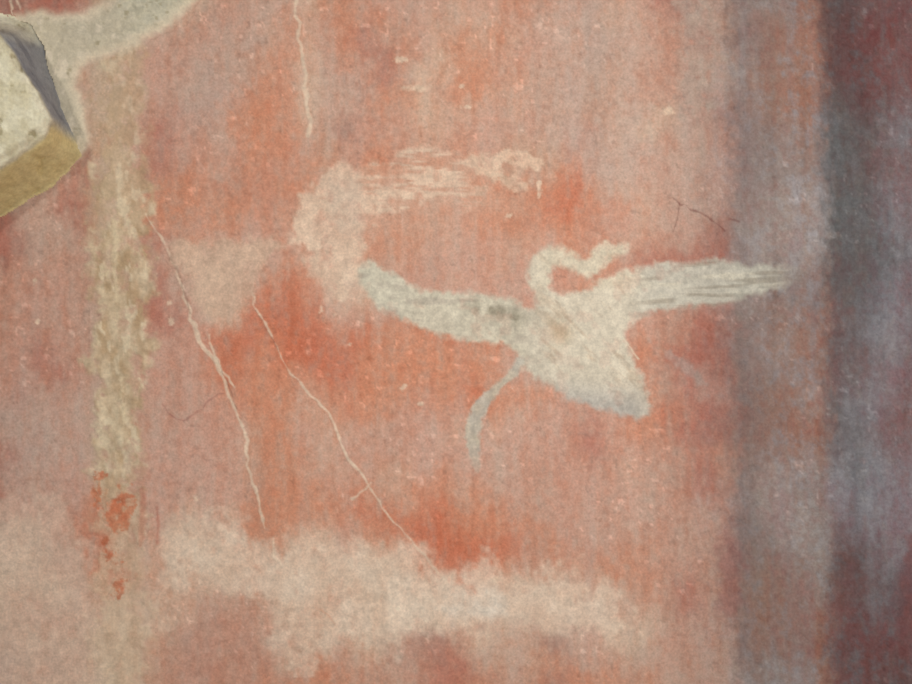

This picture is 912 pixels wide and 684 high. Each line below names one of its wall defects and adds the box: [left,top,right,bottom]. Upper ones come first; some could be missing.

crack [293,0,314,139]
peeling [97,215,122,304]
crack [161,277,267,530]
crack [251,305,414,540]
peeling [0,469,138,684]